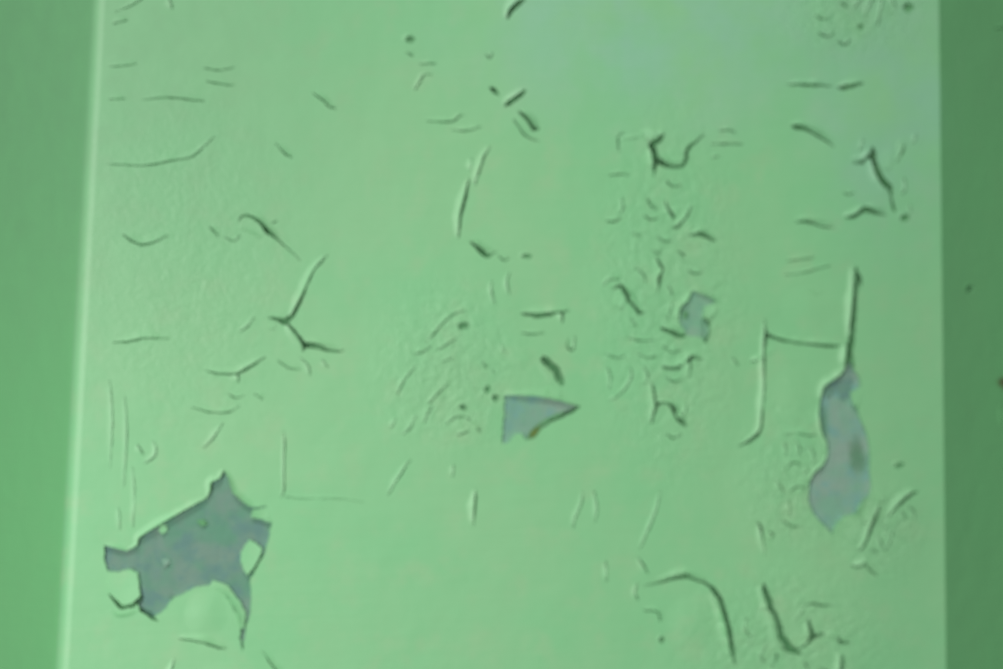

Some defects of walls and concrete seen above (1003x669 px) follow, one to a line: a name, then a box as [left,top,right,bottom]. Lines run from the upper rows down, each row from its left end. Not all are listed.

crack [489,87,540,131]
crack [617,127,743,176]
crack [790,119,896,228]
crack [237,212,345,353]
crack [612,256,702,428]
peeling [673,288,718,343]
crack [738,266,862,446]
peeling [481,382,580,444]
peeling [808,362,872,542]
peeling [104,469,272,651]
crack [646,566,736,665]
crack [756,583,849,669]